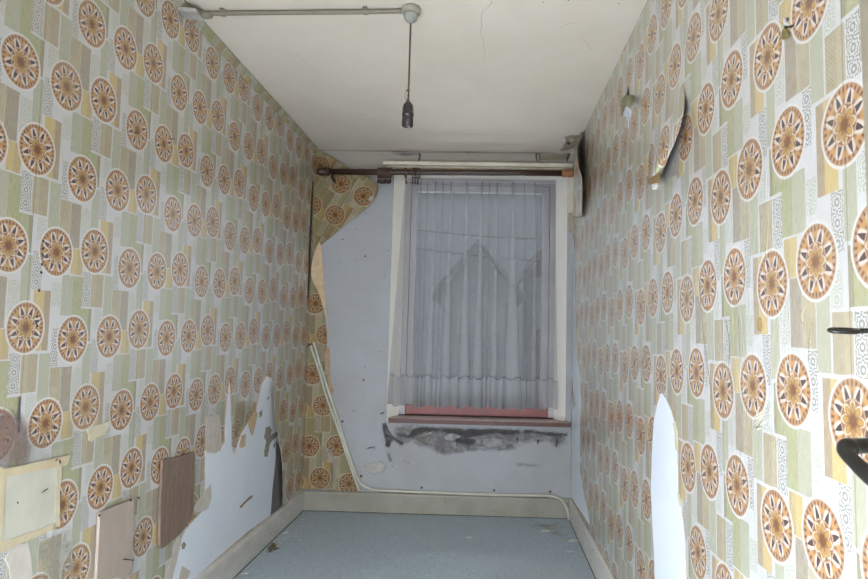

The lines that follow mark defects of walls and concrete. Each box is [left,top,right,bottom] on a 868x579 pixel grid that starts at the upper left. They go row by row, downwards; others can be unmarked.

flaking render [663,116,685,178]
peeling [172,376,283,579]
leakage [366,423,566,473]
peeling [651,393,687,579]